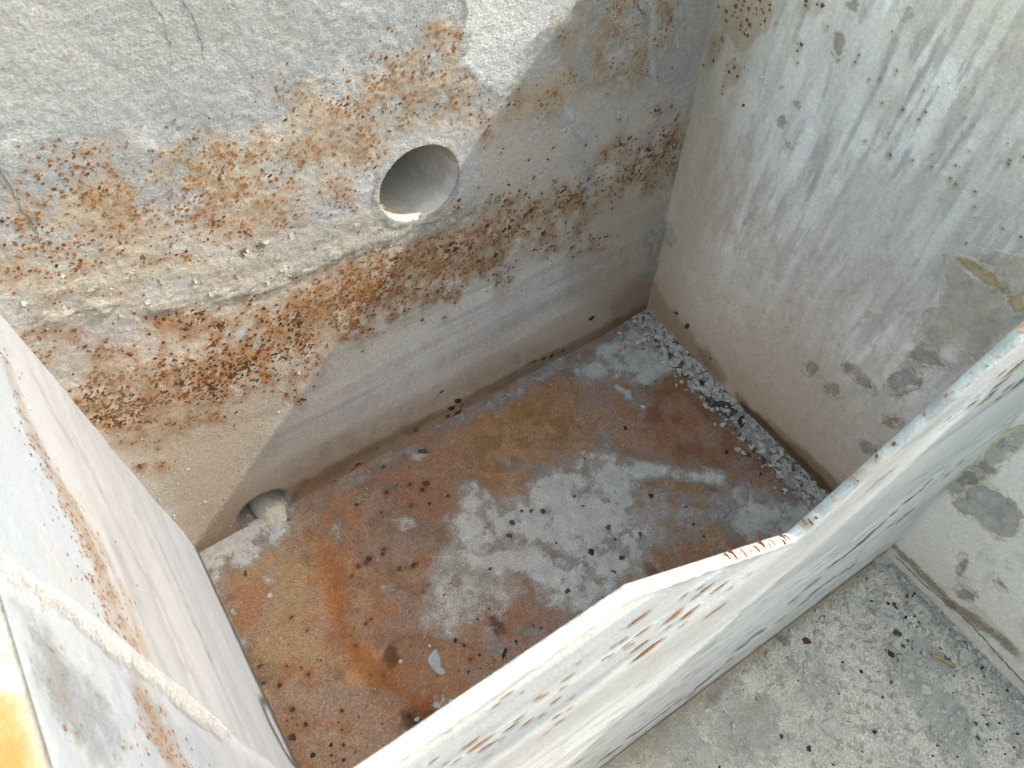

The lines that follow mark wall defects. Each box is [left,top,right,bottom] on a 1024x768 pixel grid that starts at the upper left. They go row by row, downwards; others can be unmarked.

rust [0,0,684,469]
rust [13,373,139,653]
rust [430,660,582,766]
leakage [423,437,809,660]
rust [599,461,962,765]
rust [740,402,838,501]
rust [938,360,1024,430]
peeling [951,426,1024,542]